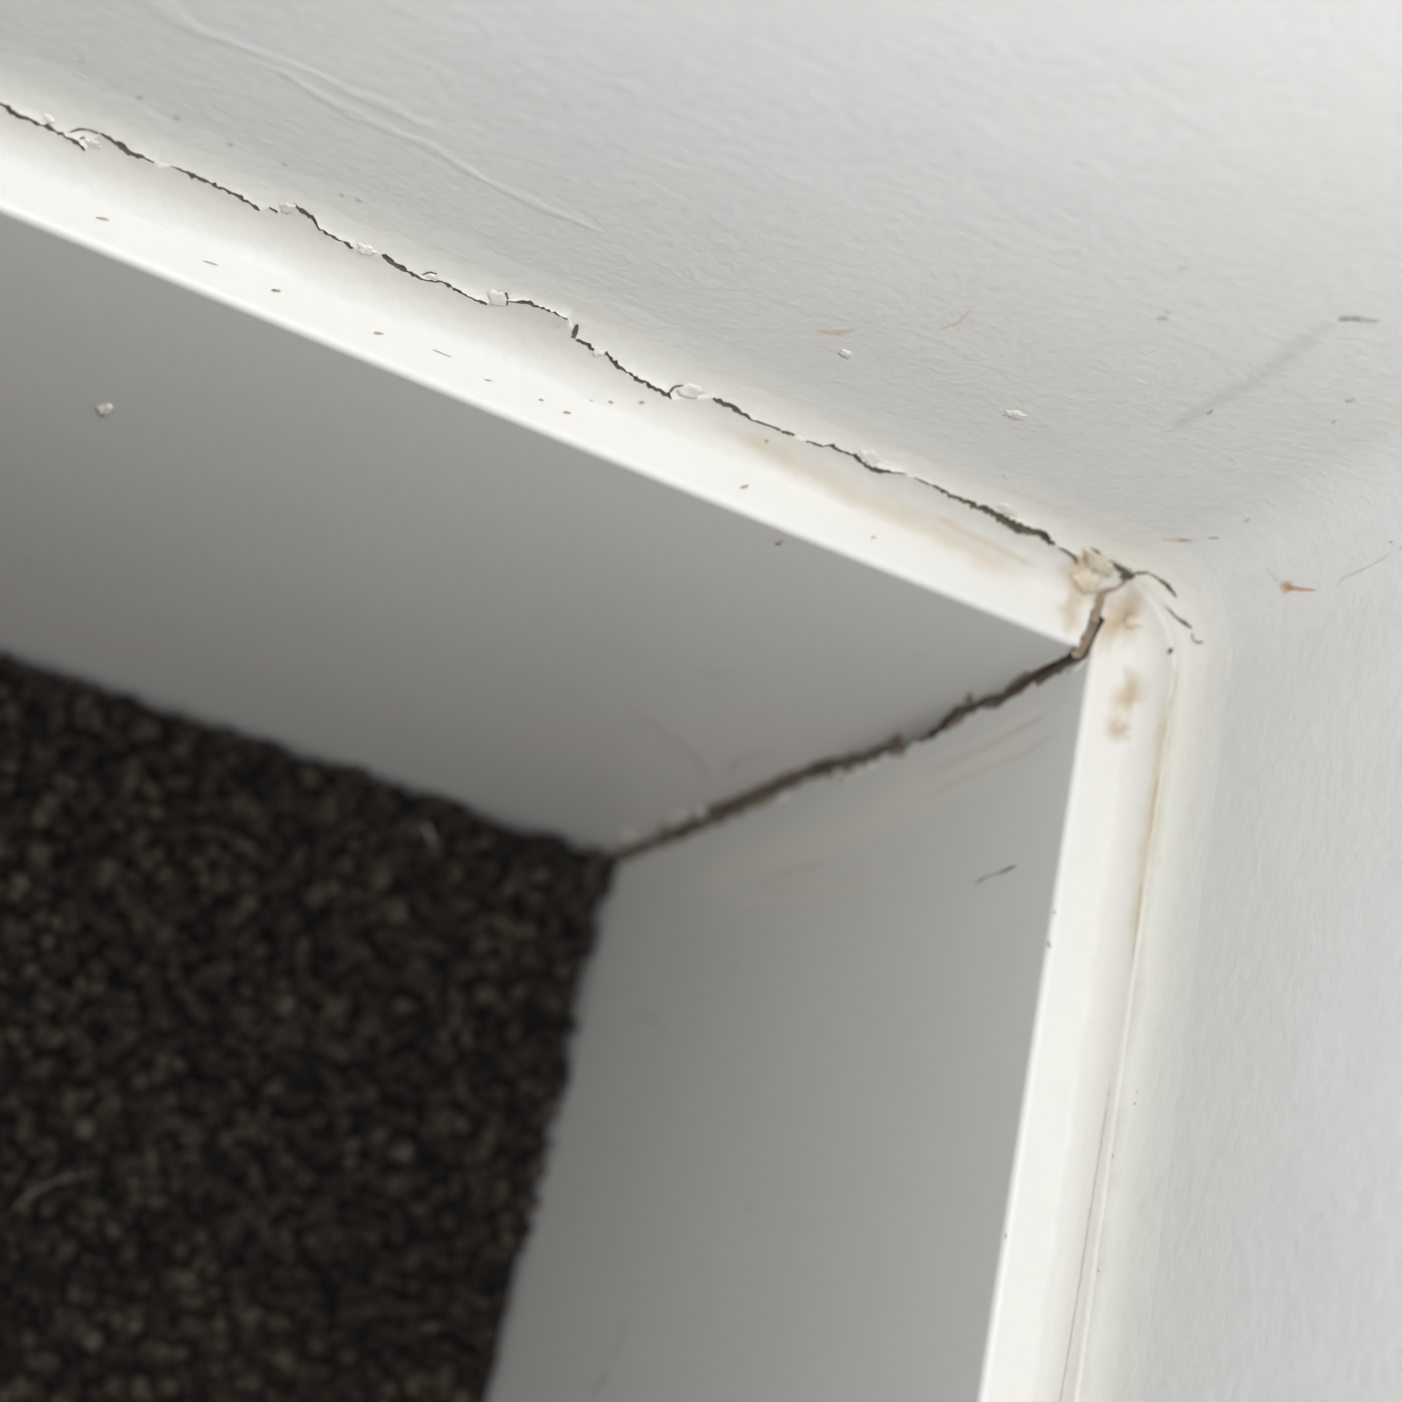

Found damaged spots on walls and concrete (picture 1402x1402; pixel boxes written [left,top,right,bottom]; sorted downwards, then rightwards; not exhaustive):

crack [0,102,1202,866]